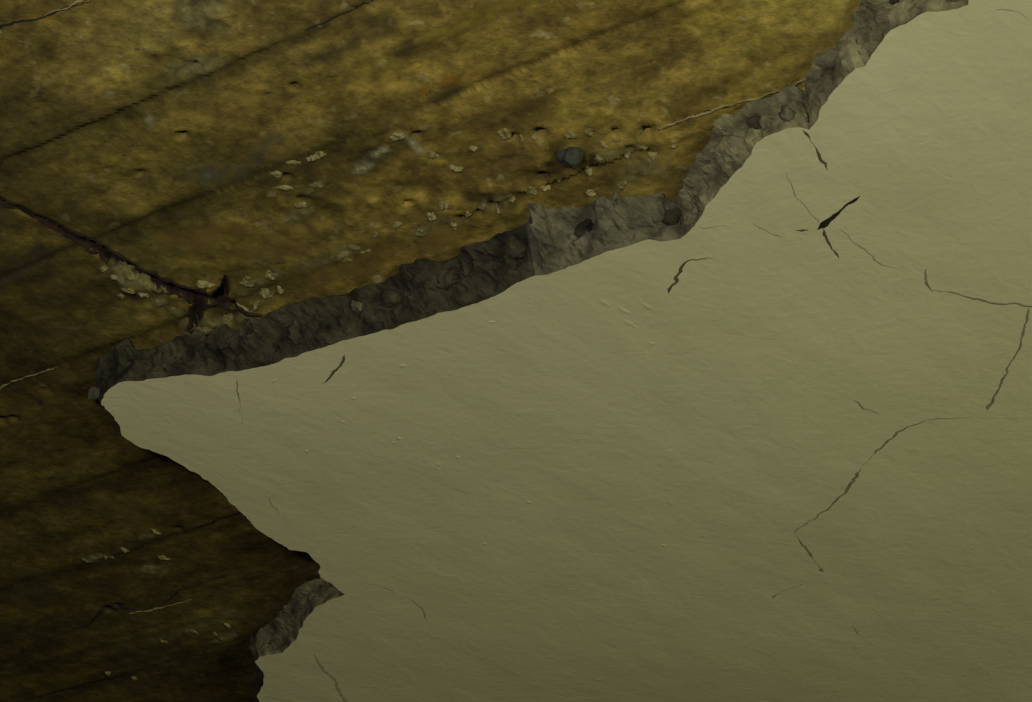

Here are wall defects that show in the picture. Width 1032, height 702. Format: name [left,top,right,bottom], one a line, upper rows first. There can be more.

crack [0,0,88,34]
crack [803,130,828,170]
crack [0,198,284,334]
spalling [88,0,968,403]
crack [667,257,708,294]
crack [751,174,897,268]
crack [323,355,345,384]
crack [772,269,1032,598]
spalling [248,562,345,702]